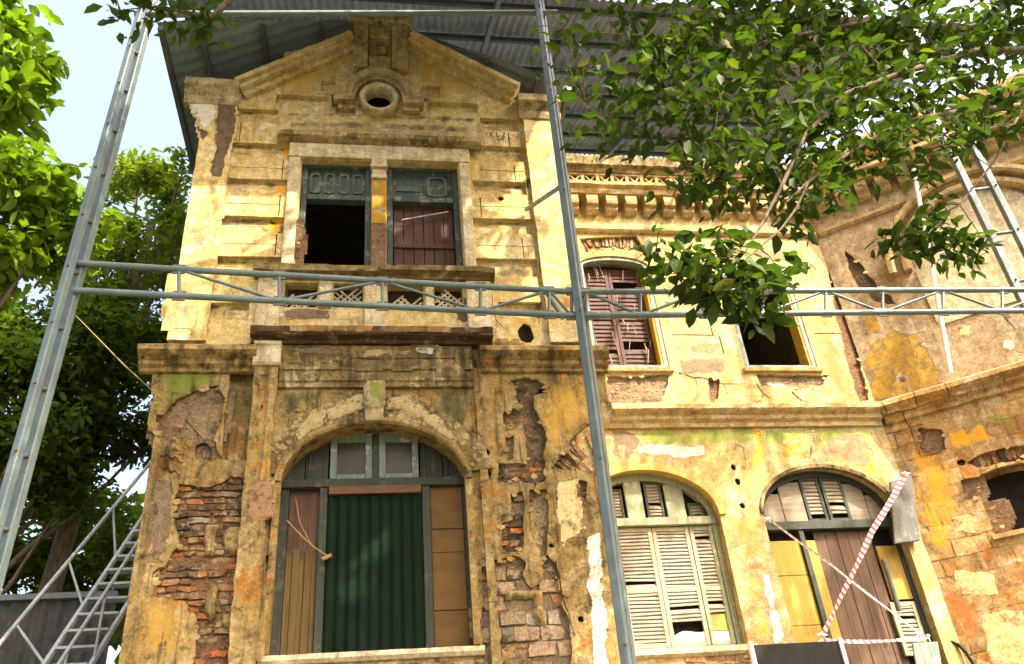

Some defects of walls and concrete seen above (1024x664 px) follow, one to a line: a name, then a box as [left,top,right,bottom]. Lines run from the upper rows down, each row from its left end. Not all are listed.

spalling [188,94,241,177]
peeling [822,252,945,402]
spalling [146,387,241,462]
spalling [916,428,945,455]
spalling [468,342,727,664]
spalling [952,446,1024,537]
spalling [120,477,277,664]